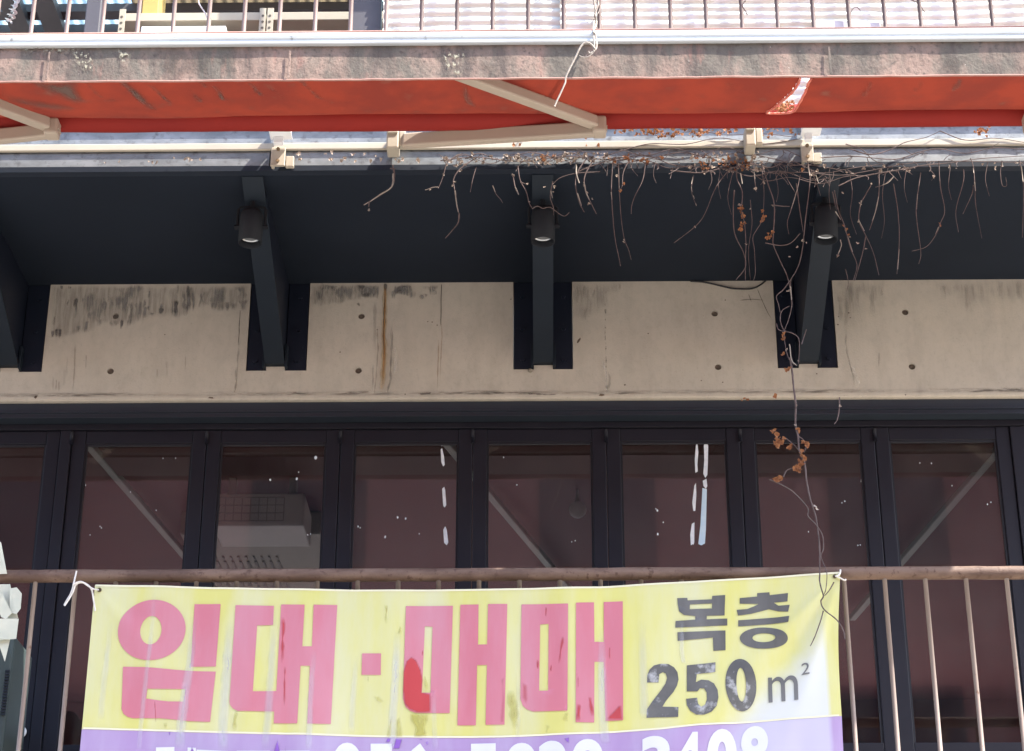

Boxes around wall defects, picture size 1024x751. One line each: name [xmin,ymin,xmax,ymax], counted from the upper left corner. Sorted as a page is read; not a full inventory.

leakage [61,286,246,326]